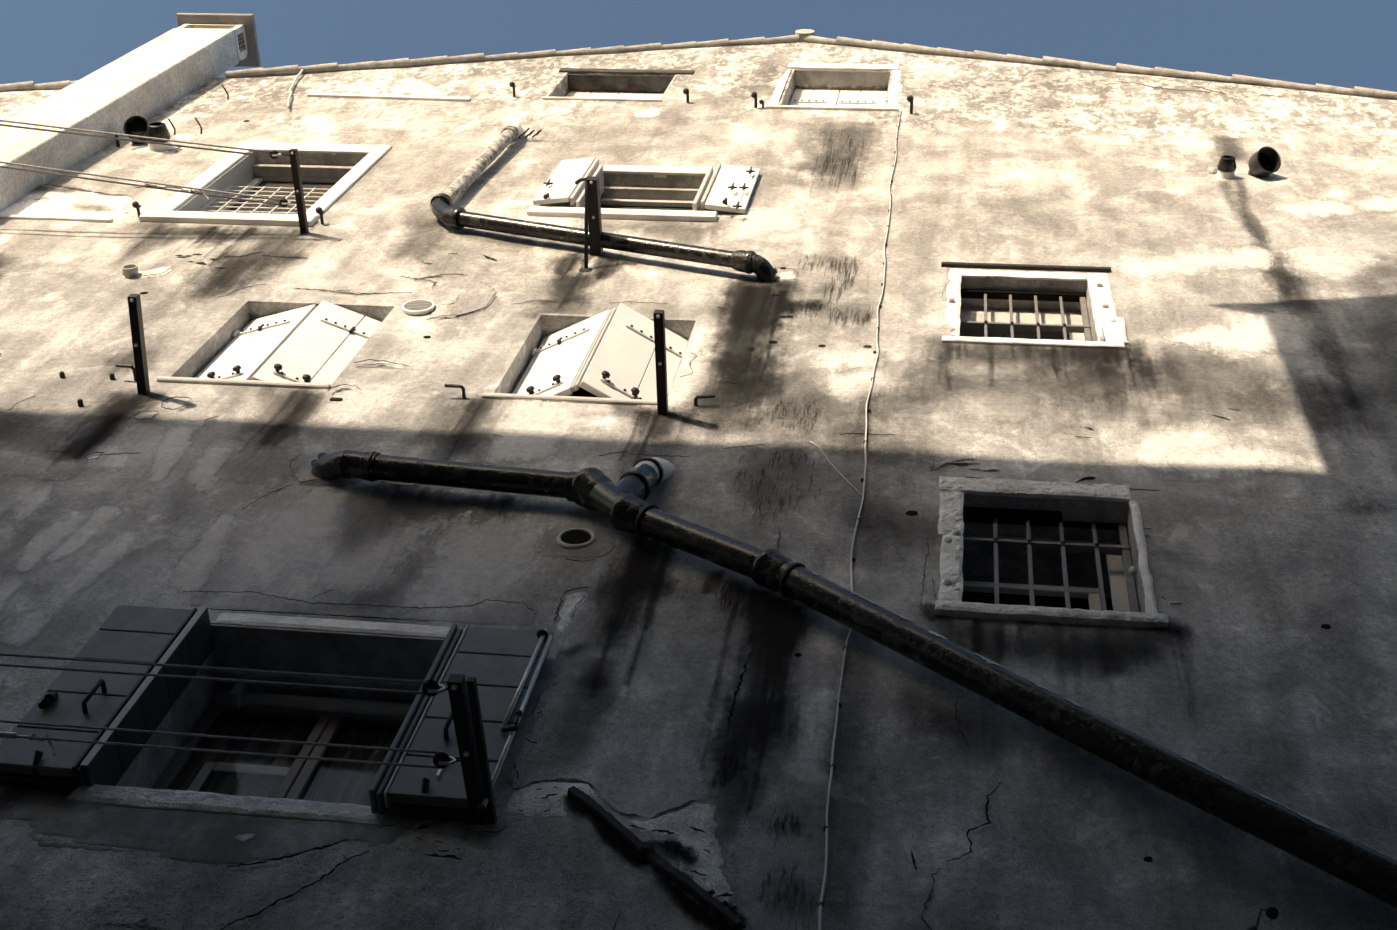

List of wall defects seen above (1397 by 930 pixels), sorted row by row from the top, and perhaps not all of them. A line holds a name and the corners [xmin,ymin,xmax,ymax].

water stain [520,215,579,227]
water stain [717,204,802,241]
water stain [636,281,819,463]
water stain [815,349,896,399]
water stain [933,340,1119,421]
flaking render [554,587,588,633]
water stain [597,536,674,646]
water stain [720,585,807,791]
flaking render [505,776,747,930]
crack [911,782,1001,930]